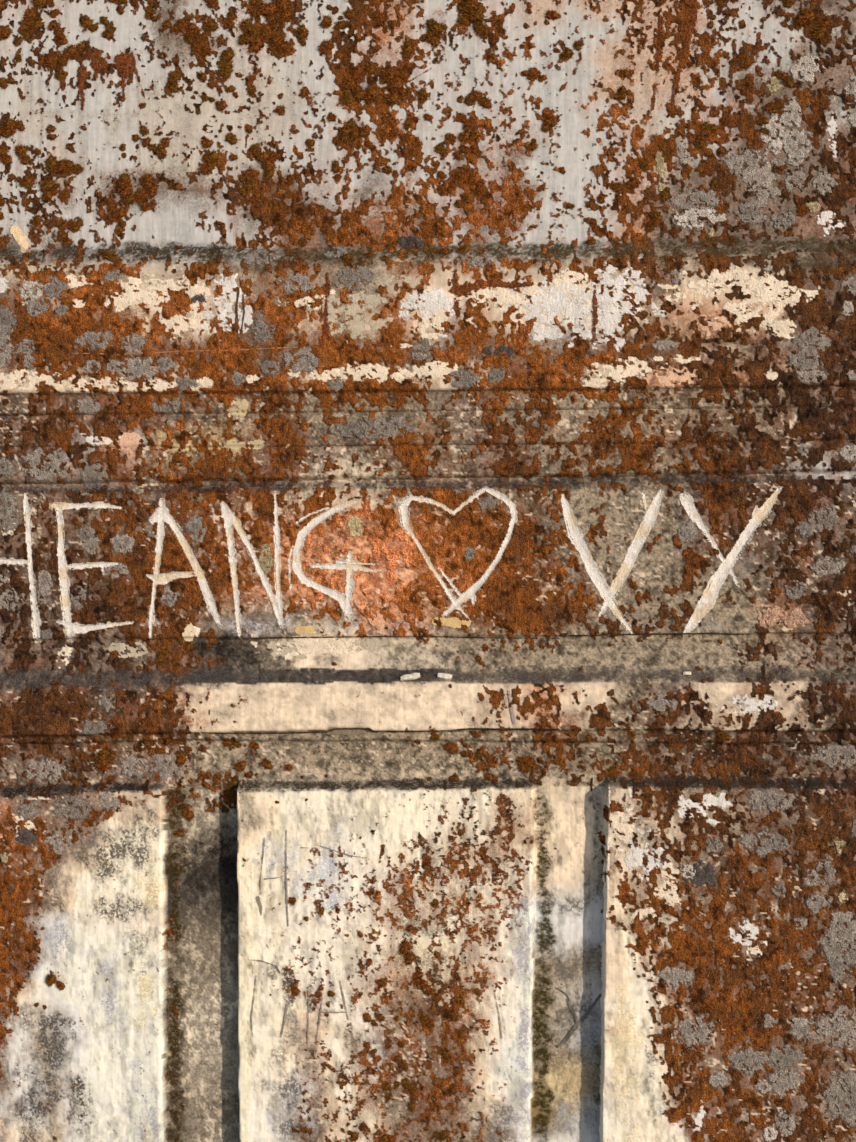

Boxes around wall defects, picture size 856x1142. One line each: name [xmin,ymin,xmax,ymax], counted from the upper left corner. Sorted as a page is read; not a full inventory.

rust [222,736,258,763]